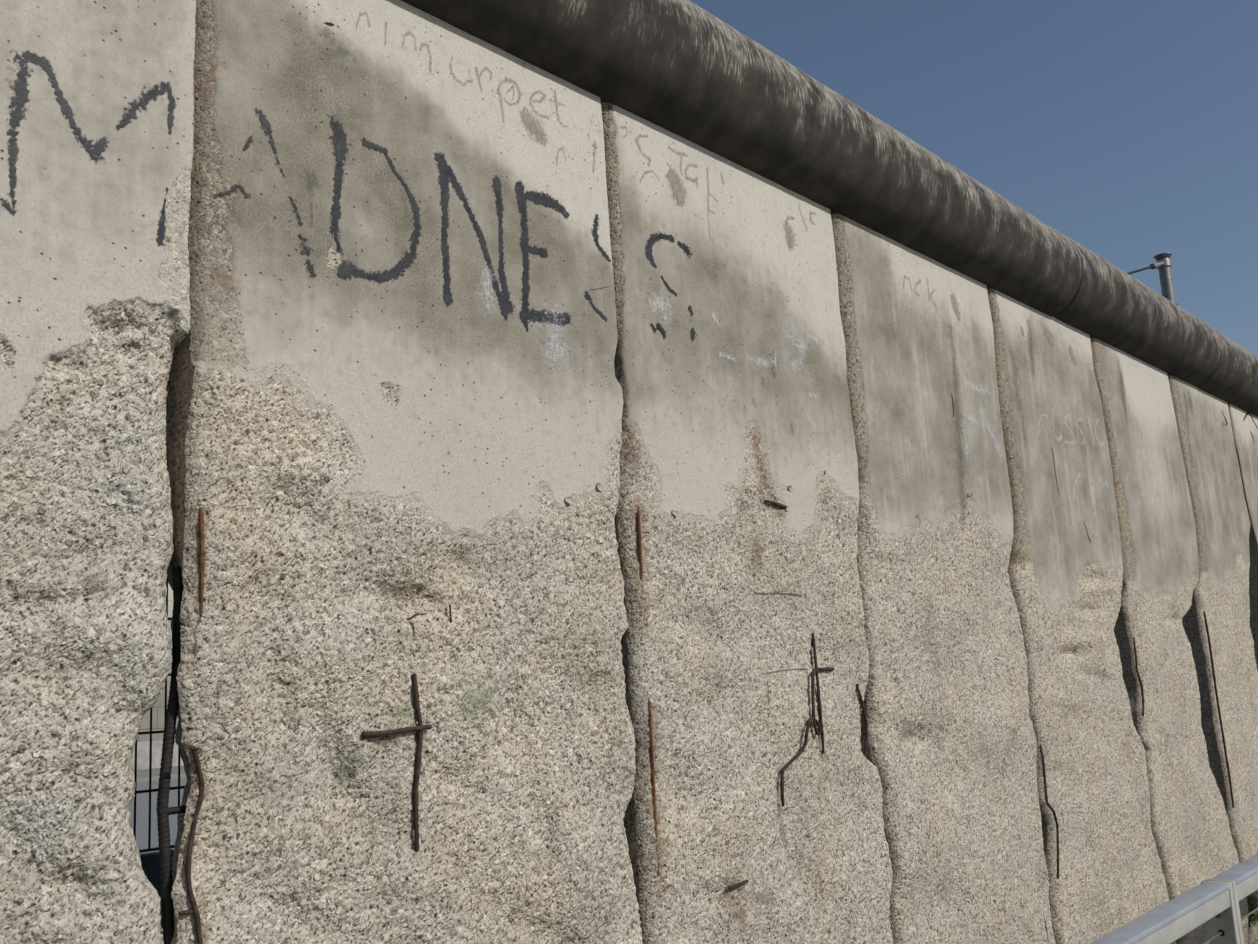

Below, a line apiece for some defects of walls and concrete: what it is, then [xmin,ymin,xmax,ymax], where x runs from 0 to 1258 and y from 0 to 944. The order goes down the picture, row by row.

spalling [0,0,643,944]
rust [156,566,205,944]
crack [193,617,201,655]
rust [362,674,432,851]
rust [648,701,660,877]
rust [780,633,835,807]
spalling [617,213,1258,944]
rust [1039,745,1060,879]
rust [1203,612,1234,808]